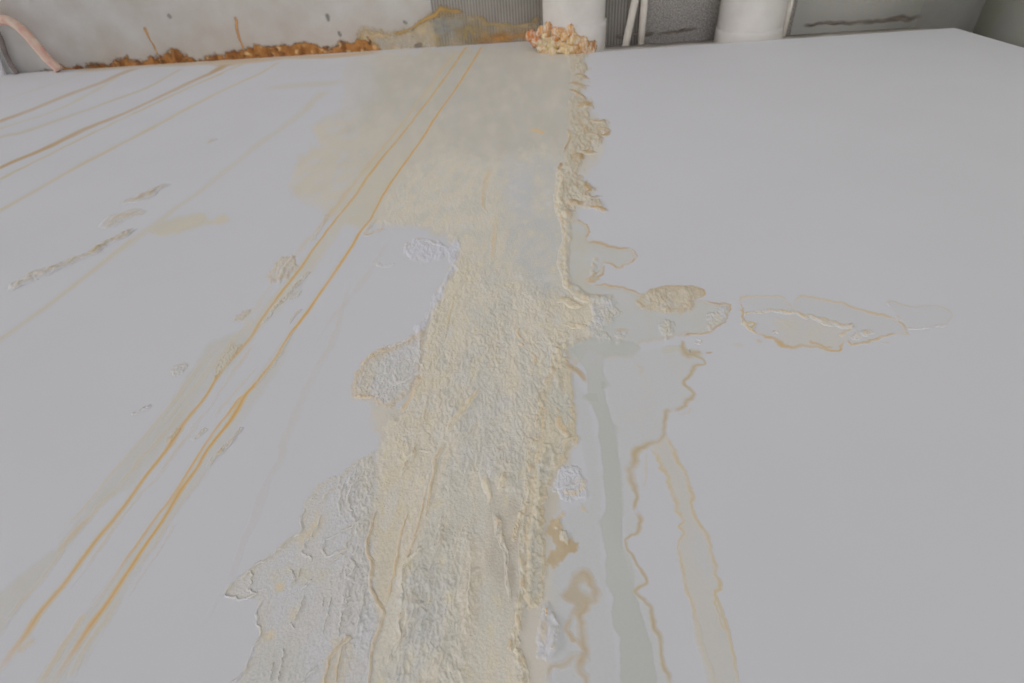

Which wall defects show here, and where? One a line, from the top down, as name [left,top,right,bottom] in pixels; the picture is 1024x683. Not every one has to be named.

peeling [4,183,172,293]
rust [0,18,484,683]
damp [255,6,912,683]